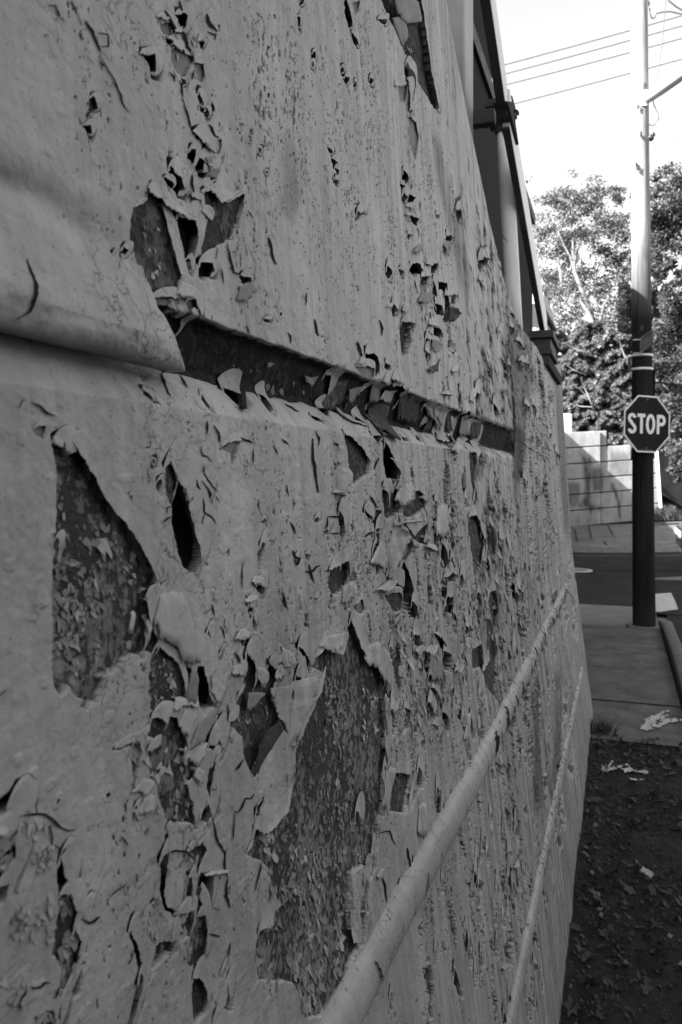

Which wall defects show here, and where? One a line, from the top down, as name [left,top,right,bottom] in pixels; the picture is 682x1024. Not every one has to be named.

peeling [50,0,566,1022]
crack [112,732,140,749]
crack [0,774,126,1024]